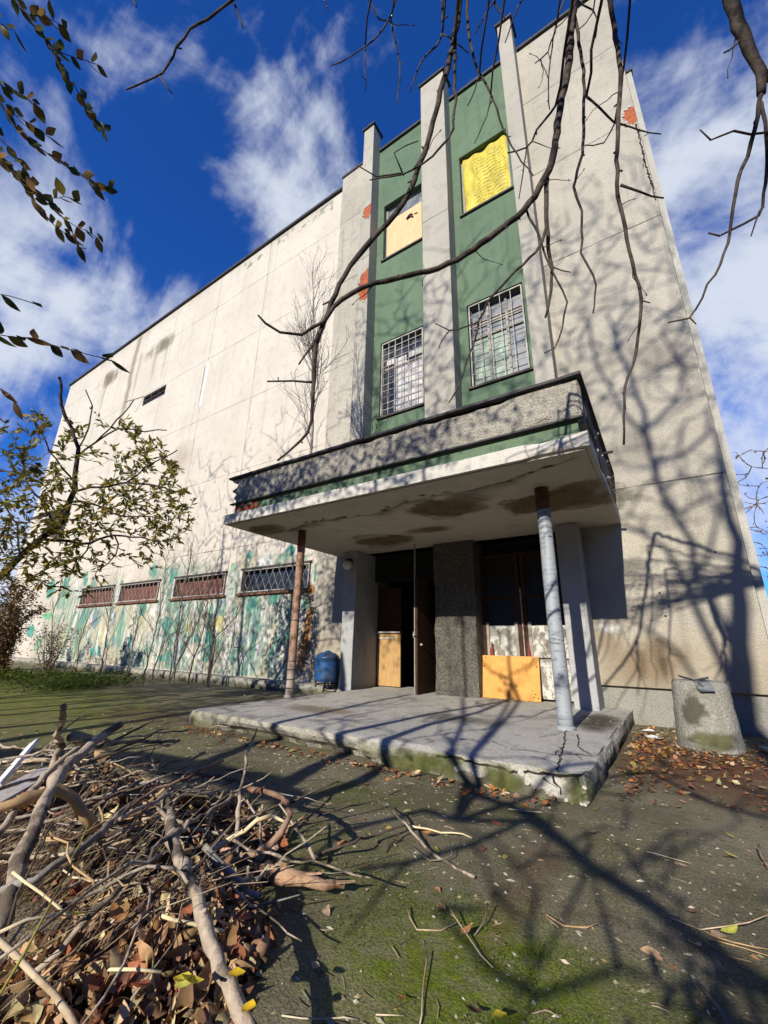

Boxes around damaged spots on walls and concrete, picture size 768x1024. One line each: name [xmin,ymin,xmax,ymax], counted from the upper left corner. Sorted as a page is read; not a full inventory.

flaking render [622,105,637,128]
flaking render [358,268,368,303]
damp [353,496,485,548]
damp [498,495,536,514]
damp [549,481,637,512]
damp [683,697,735,751]
crack [436,730,598,795]